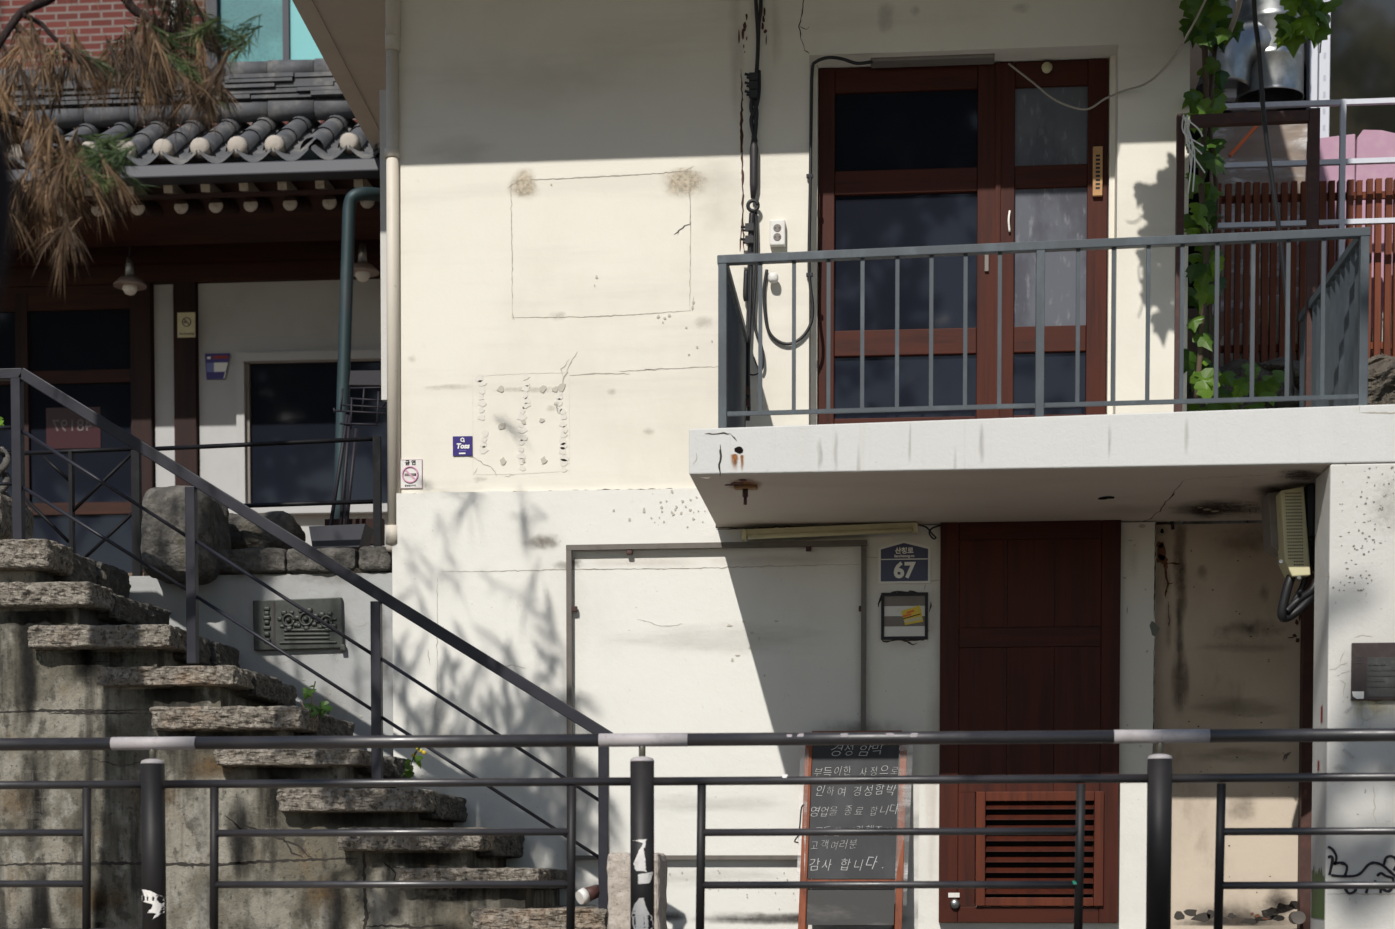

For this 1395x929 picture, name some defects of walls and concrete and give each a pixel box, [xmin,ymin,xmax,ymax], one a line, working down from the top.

corrosion [732,454,754,485]
water stain [1327,466,1394,591]
water stain [6,611,67,717]
water stain [15,759,44,839]
water stain [20,873,51,929]